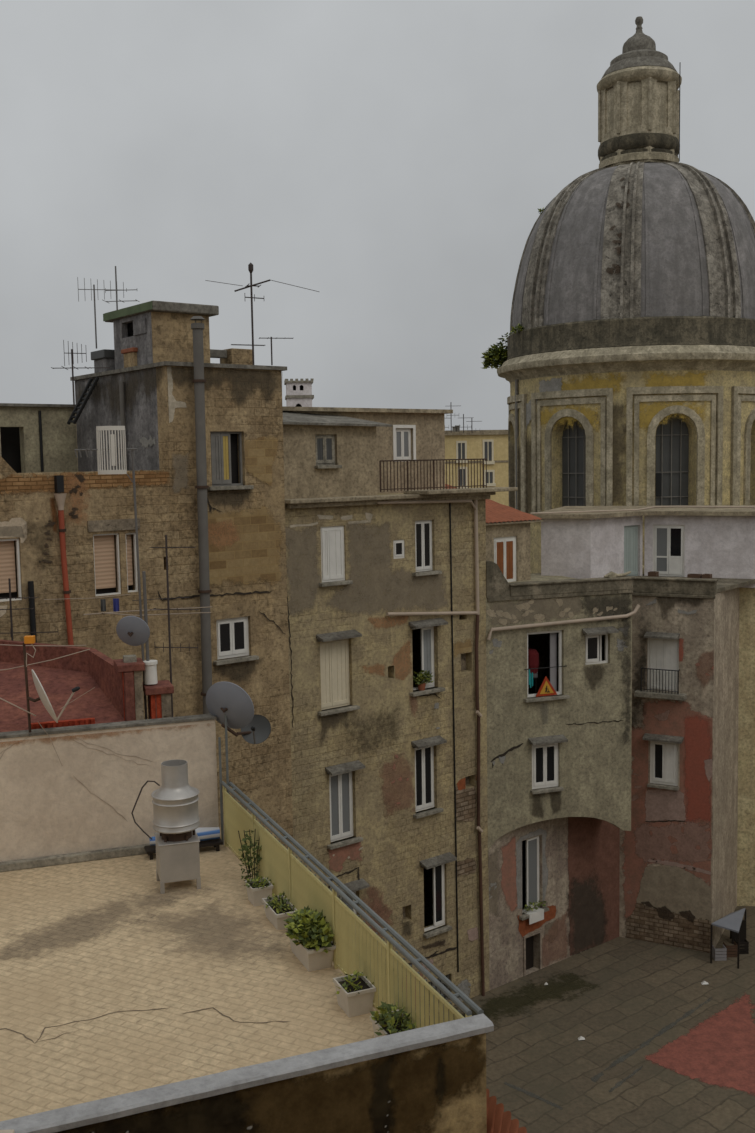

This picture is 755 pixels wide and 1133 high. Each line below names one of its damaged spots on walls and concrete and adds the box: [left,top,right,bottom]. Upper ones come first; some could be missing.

crack [491,743,523,768]
peeling [489,700,713,956]
crack [2,1007,288,1043]
water stain [55,1036,486,1133]